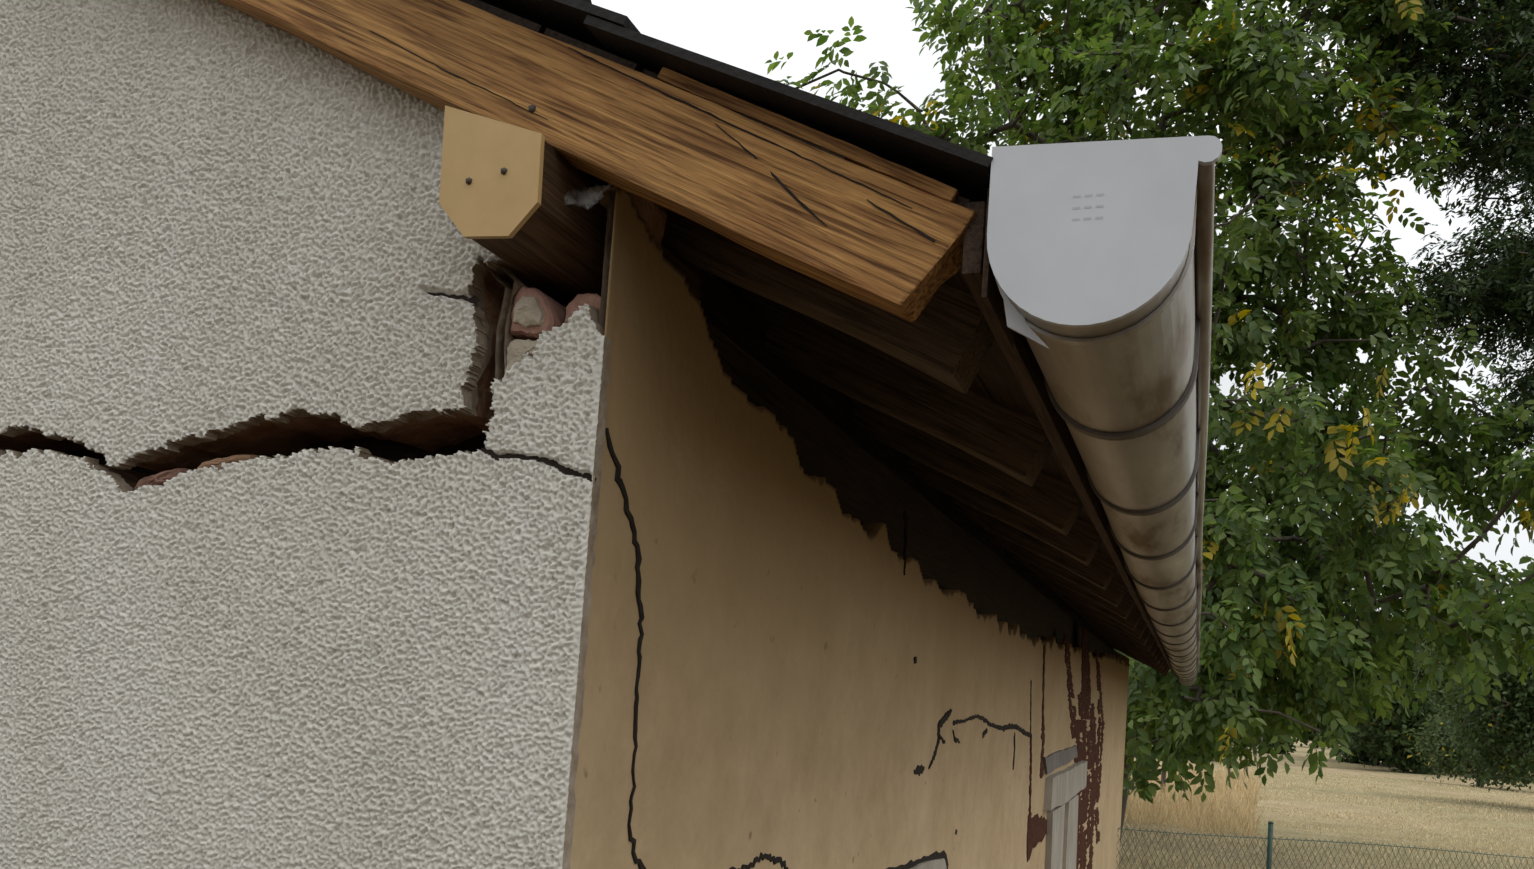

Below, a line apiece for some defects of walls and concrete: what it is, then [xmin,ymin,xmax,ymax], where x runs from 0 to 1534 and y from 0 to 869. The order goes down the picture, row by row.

crack [0,264,646,869]
crack [902,510,910,575]
crack [914,680,1032,776]
crack [729,852,789,869]
peeling [1026,814,1047,862]